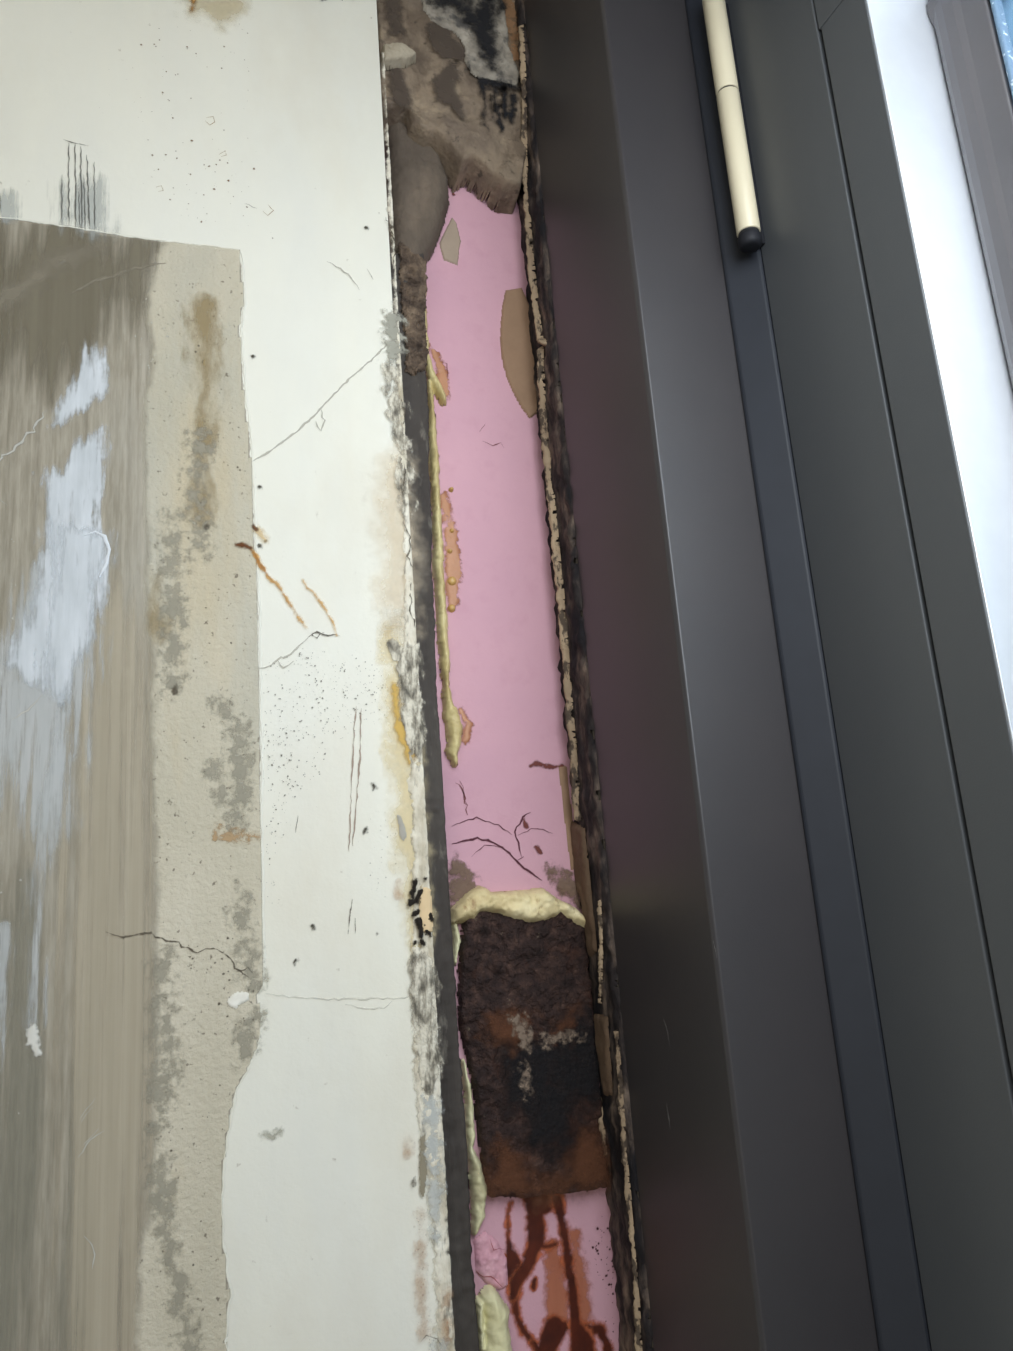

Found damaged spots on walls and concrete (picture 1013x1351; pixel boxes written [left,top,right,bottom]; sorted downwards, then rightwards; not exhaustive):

damp [385,0,406,35]
damp [389,68,412,109]
damp [426,22,465,119]
peeling [421,0,520,87]
damp [478,77,522,132]
damp [503,0,519,61]
crack [258,631,340,669]
peeling [0,216,266,1351]
crack [452,812,550,880]
rust [489,1013,528,1054]
rust [489,1133,614,1351]